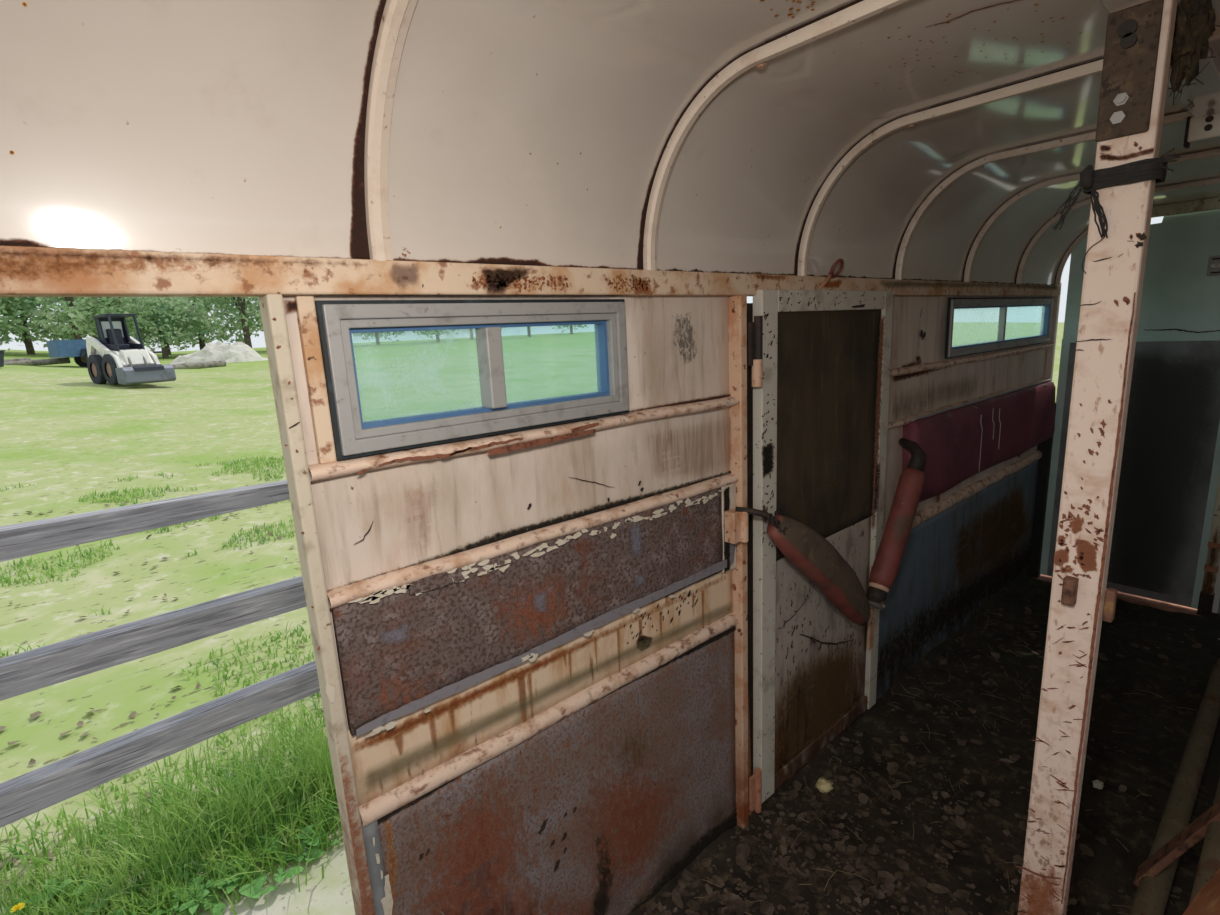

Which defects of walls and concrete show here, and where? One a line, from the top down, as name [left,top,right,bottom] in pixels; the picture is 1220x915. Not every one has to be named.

corrosion [606,0,864,295]
corrosion [0,251,191,280]
corrosion [472,267,571,294]
peeling [349,490,722,604]
peeling [356,543,736,737]
corrosion [1020,292,1136,915]
corrosion [339,757,375,915]
corrosion [355,591,736,913]